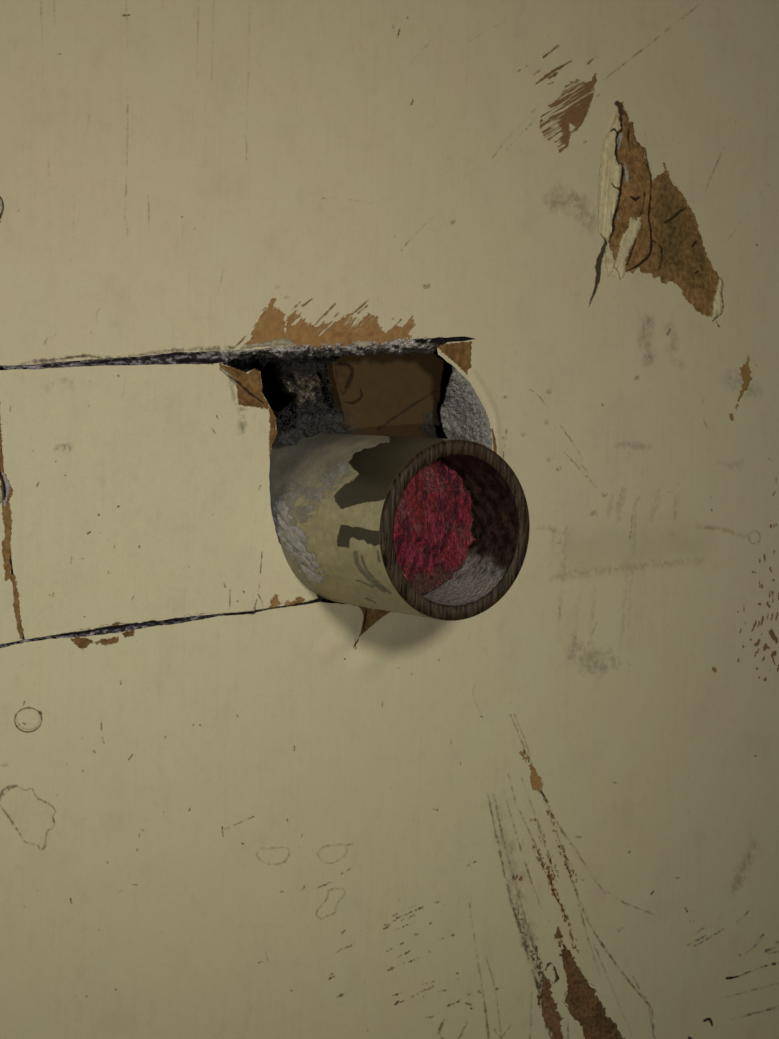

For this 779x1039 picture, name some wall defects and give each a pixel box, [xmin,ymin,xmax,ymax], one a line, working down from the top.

peeling [206,298,446,431]
peeling [334,366,492,509]
crack [0,555,322,649]
peeling [337,525,380,548]
peeling [738,551,779,681]
spalling [515,749,626,1039]